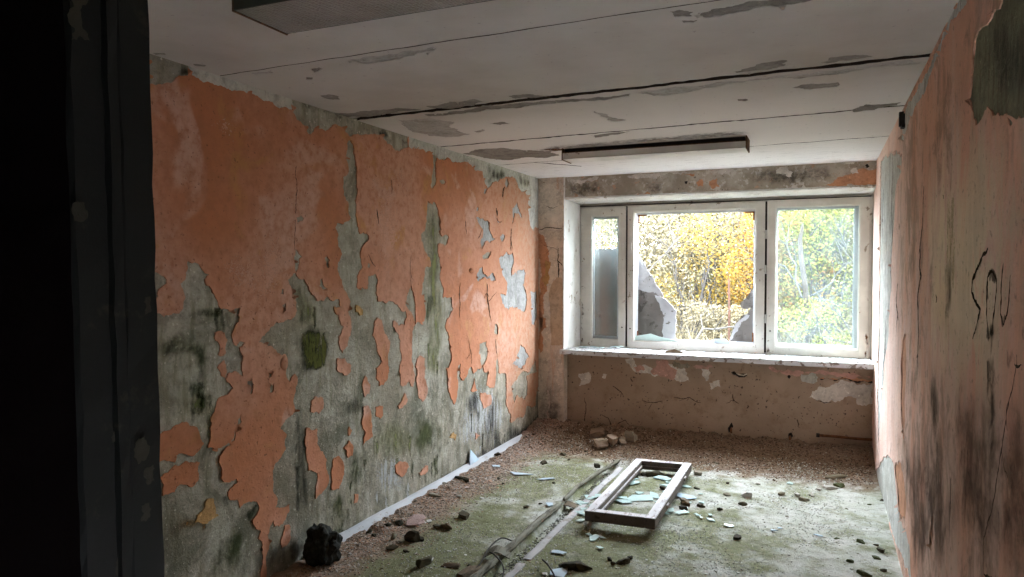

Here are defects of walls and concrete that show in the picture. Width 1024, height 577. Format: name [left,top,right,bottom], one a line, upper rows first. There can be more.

peeling [965,0,1024,125]
peeling [564,0,967,429]
leakage [165,338,206,371]
leakage [201,308,224,329]
leakage [300,302,319,370]
peeling [134,53,916,577]
leakage [190,386,213,438]
leakage [456,384,521,457]
leakage [296,427,307,509]
leakage [333,420,438,534]
leakage [907,416,1024,551]
leakage [215,532,242,568]